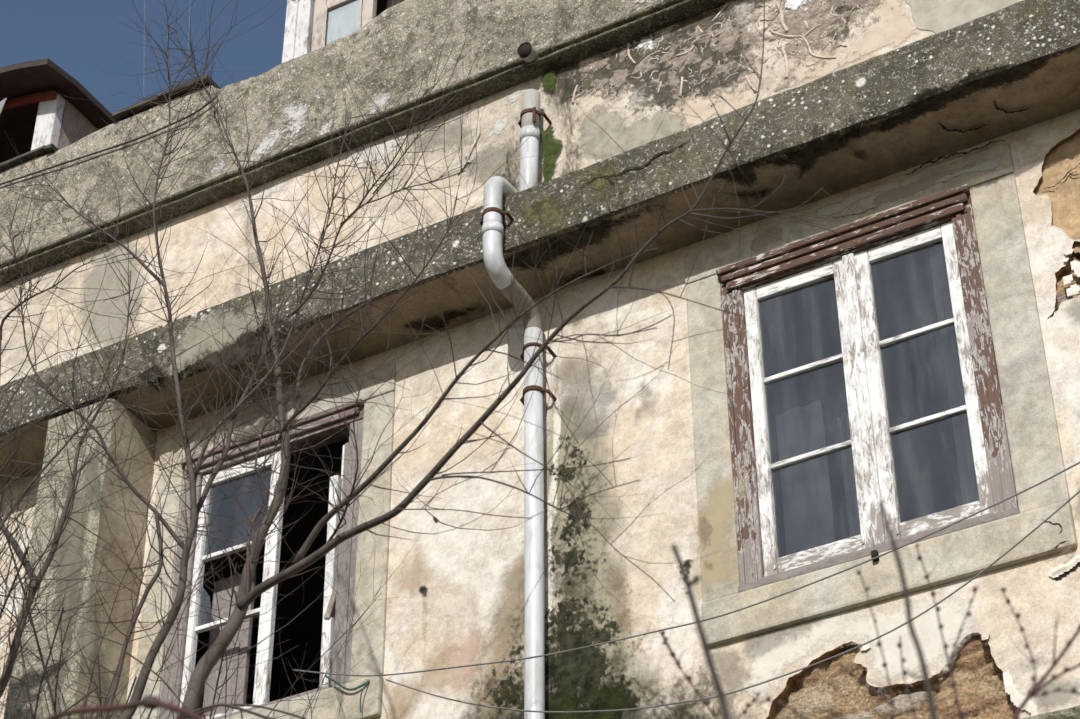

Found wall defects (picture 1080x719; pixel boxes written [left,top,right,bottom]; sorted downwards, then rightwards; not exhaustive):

water stain [548,0,764,176]
flaking render [673,93,751,128]
water stain [785,0,807,14]
water stain [820,0,873,42]
flaking render [784,0,917,89]
water stain [713,48,1076,199]
water stain [502,154,519,191]
spalling [1032,128,1080,312]
water stain [544,403,651,717]
water stain [476,558,524,718]
spalling [765,632,1038,719]